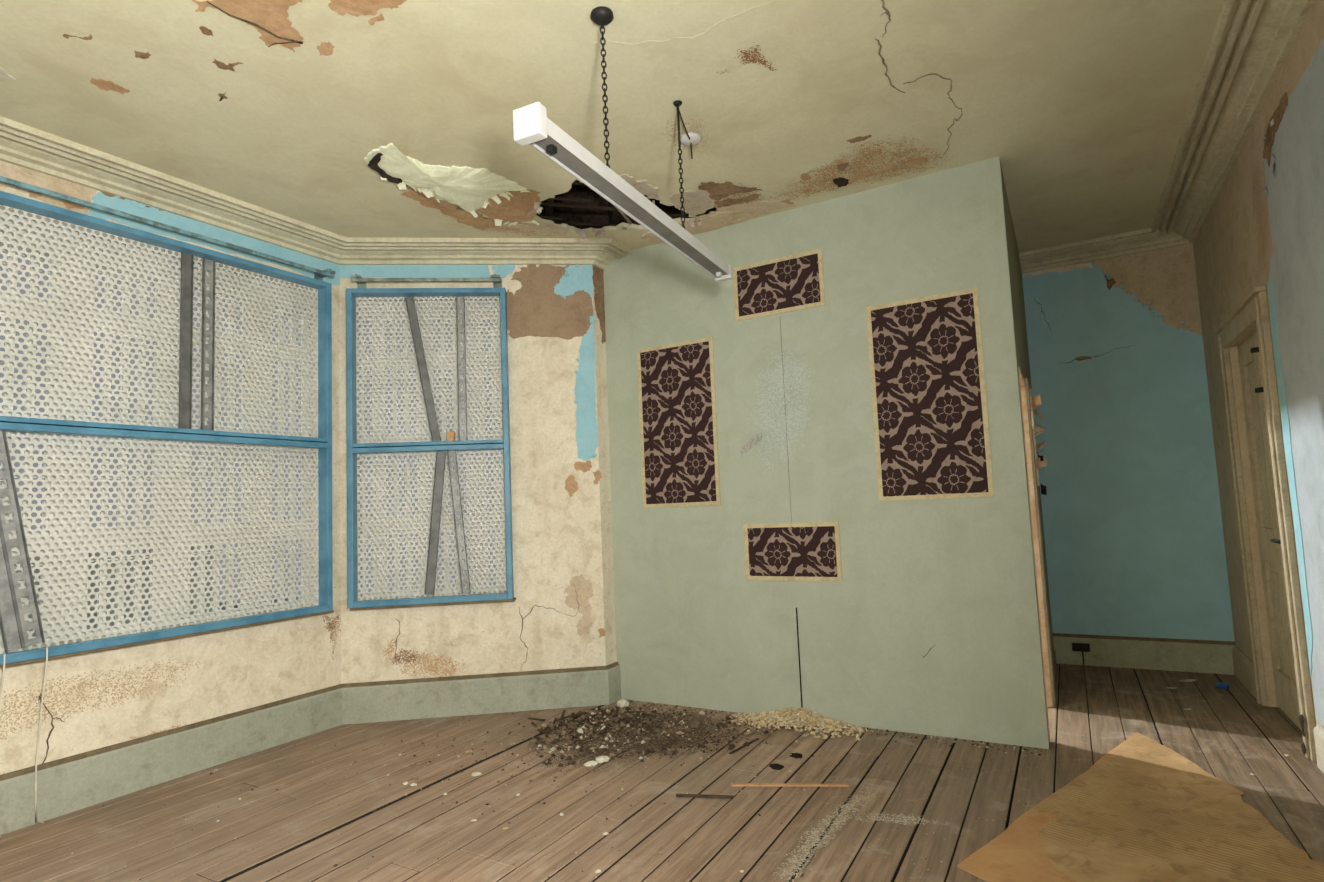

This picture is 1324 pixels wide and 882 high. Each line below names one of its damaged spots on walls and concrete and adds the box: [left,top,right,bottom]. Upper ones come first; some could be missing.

spalling [192,0,334,56]
spalling [328,0,407,25]
crack [875,0,963,154]
spalling [479,185,640,235]
spalling [643,181,798,222]
water stain [715,133,957,207]
peeling [1023,243,1203,336]
spalling [0,165,606,497]